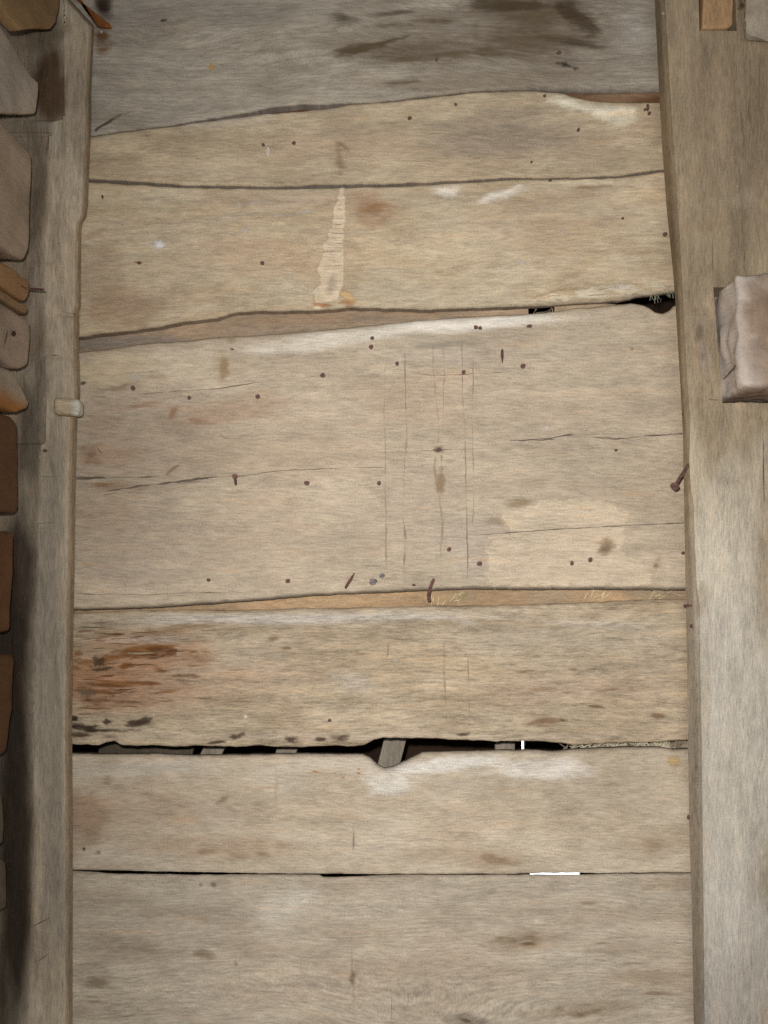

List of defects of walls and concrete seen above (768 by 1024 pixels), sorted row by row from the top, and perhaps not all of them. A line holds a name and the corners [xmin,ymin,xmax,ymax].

crack [511,433,571,441]
crack [597,432,683,440]
crack [77,476,215,495]
crack [487,523,680,535]
rust [75,625,214,715]